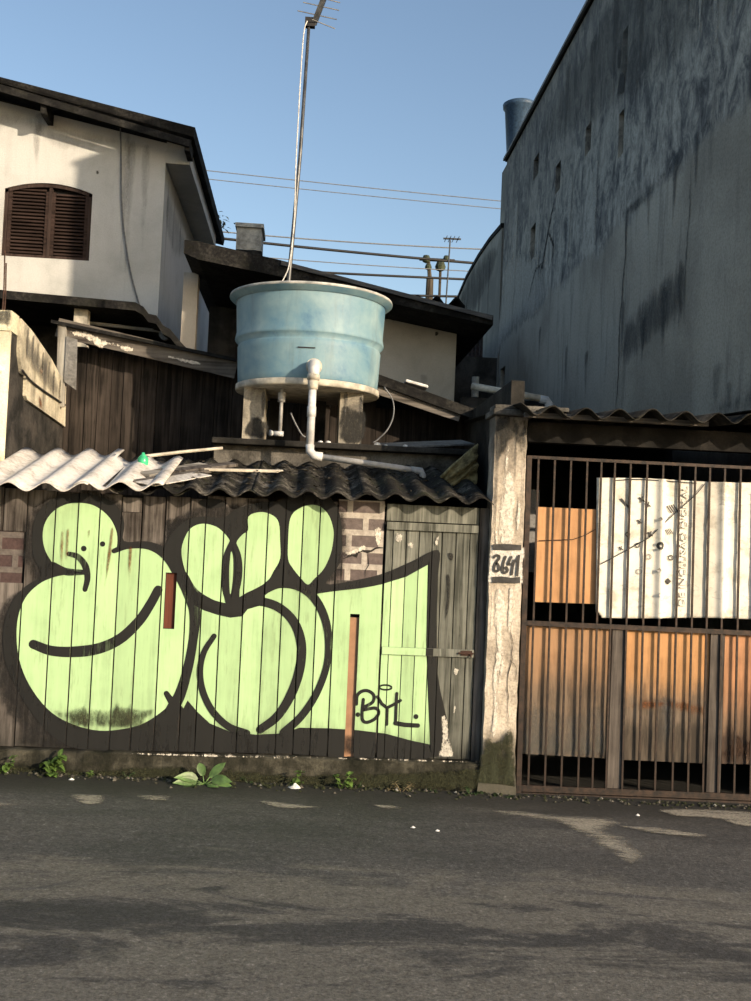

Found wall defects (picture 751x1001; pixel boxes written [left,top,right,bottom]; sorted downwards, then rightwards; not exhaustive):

damp [26,328,61,396]
peeling [419,706,456,762]